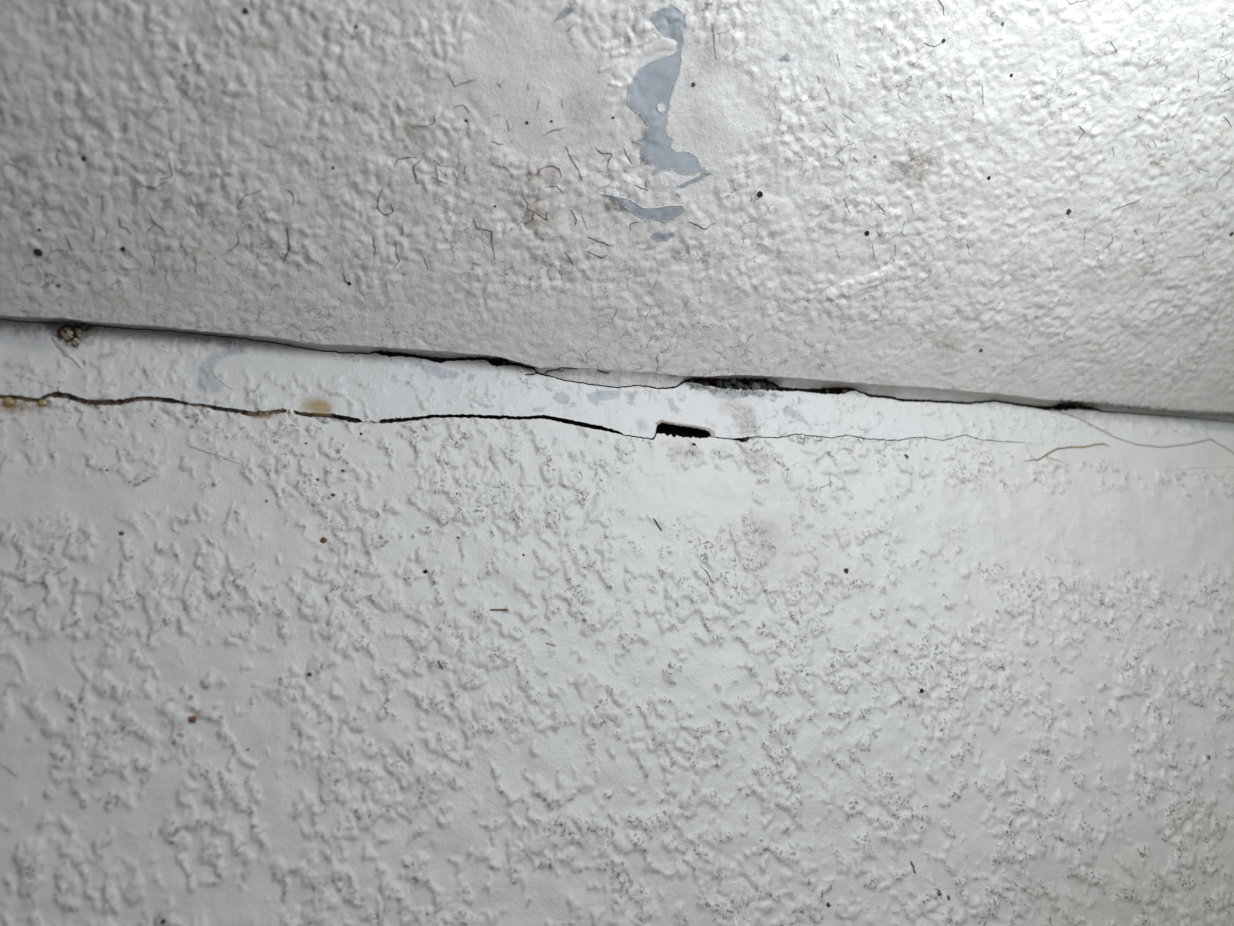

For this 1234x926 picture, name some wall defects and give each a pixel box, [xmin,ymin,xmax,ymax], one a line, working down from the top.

peeling [556,7,576,32]
peeling [627,3,713,187]
peeling [599,192,686,242]
crack [0,319,1234,462]